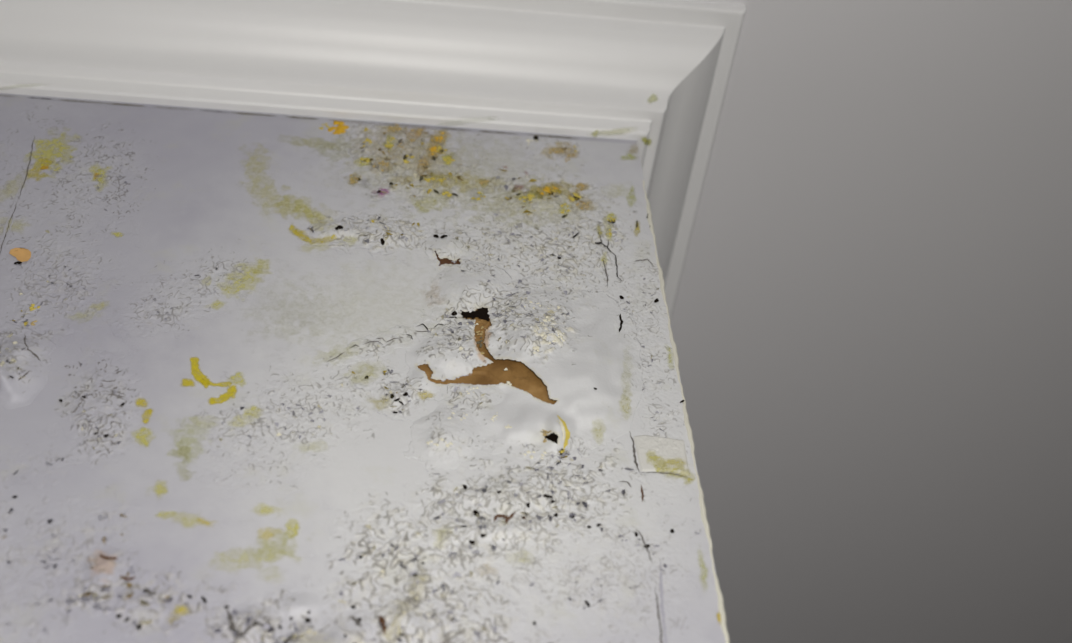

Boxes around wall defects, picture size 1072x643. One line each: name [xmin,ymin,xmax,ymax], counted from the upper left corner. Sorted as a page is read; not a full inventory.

crack [0,135,35,259]
mould [319,121,349,135]
mould [385,123,456,197]
damp [519,183,589,214]
peeling [0,100,714,643]
damp [539,415,570,454]